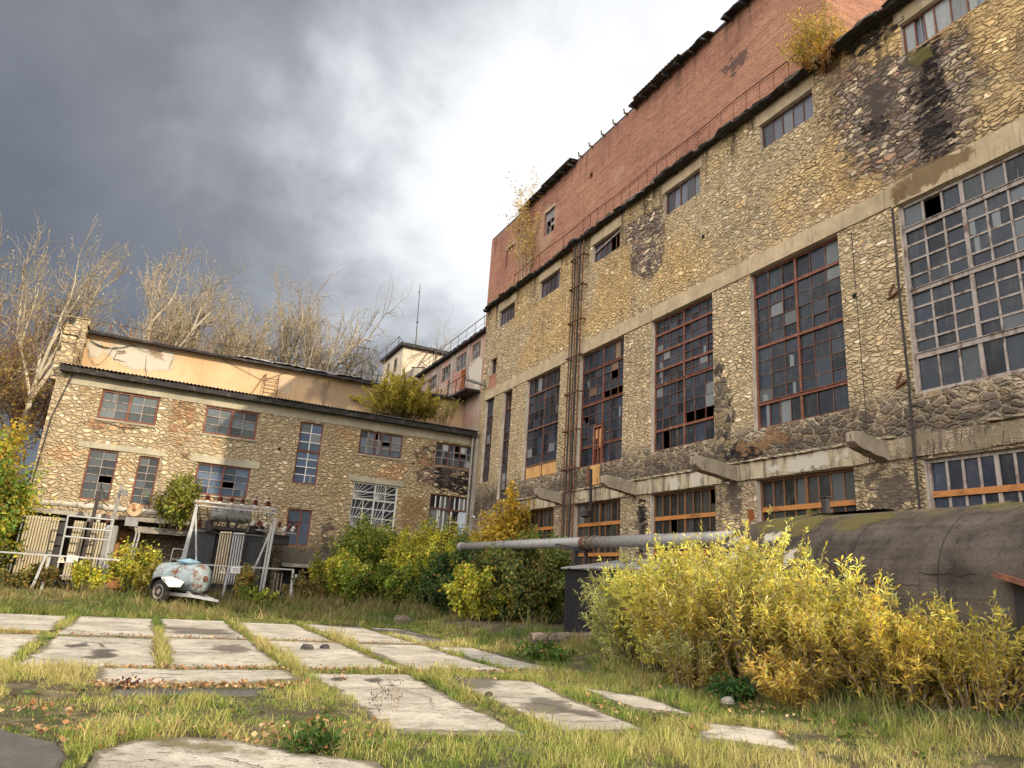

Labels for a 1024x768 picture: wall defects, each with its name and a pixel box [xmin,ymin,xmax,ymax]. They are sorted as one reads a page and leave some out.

damp [722,49,748,77]
damp [845,15,973,204]
spalling [624,205,665,280]
flaking render [88,339,175,372]
spalling [412,444,472,492]